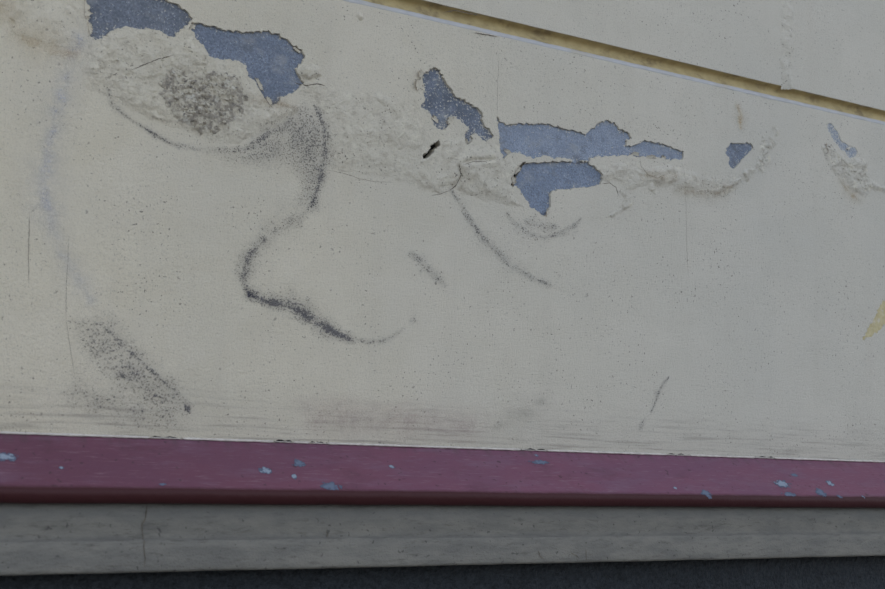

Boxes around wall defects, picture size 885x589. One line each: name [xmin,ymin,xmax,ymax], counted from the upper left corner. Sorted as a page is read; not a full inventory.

peeling [84,0,304,135]
peeling [415,68,682,217]
peeling [725,143,752,168]
peeling [826,123,858,158]